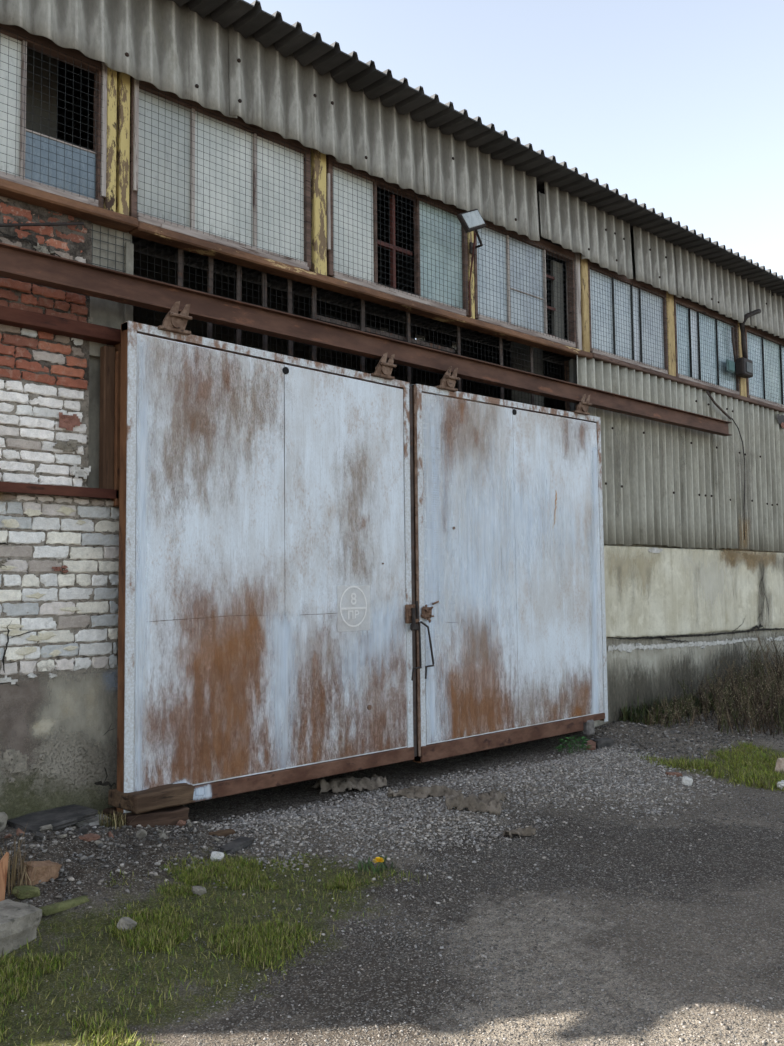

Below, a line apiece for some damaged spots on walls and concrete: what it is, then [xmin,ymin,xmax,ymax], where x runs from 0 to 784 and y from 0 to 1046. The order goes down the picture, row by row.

spalling [33,243,55,255]
spalling [53,412,82,452]
spalling [70,465,91,479]
peeling [1,509,43,528]
peeling [2,624,78,657]
crack [0,624,33,698]